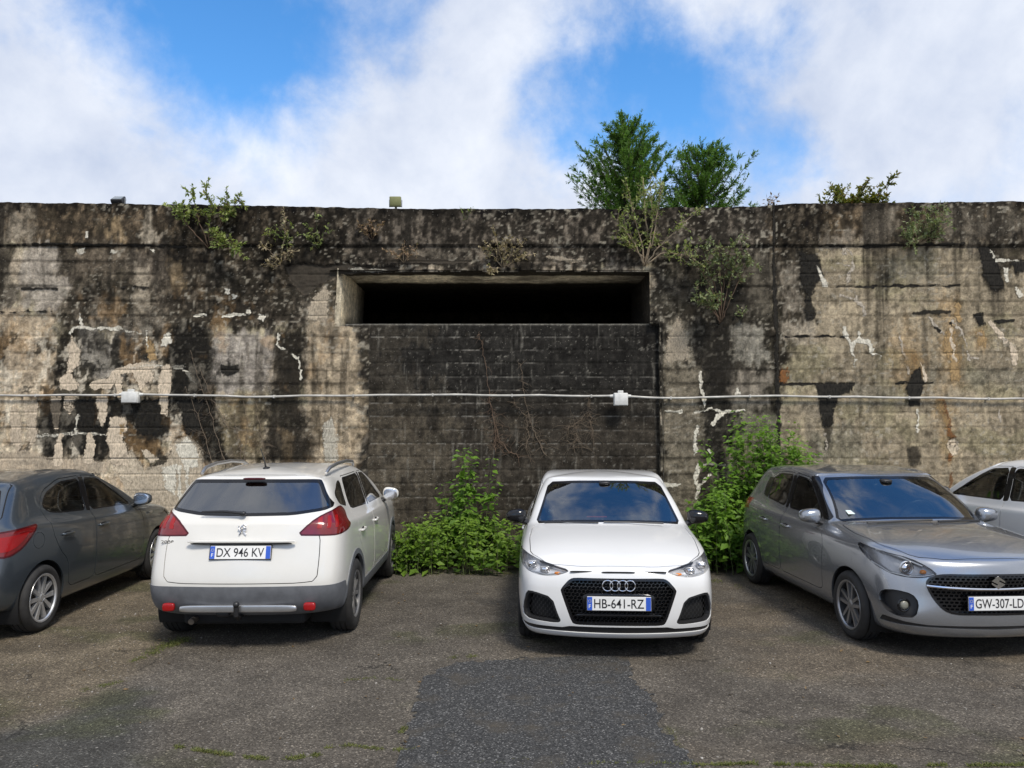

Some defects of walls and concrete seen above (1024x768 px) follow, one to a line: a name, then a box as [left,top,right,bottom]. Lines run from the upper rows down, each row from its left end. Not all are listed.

damp [799,251,828,321]
damp [977,244,1024,298]
damp [221,363,239,376]
damp [842,326,881,367]
damp [912,302,1018,366]
damp [36,330,205,468]
damp [323,419,338,461]
damp [693,425,711,455]
damp [815,382,855,451]
damp [907,446,921,466]
damp [906,367,924,433]